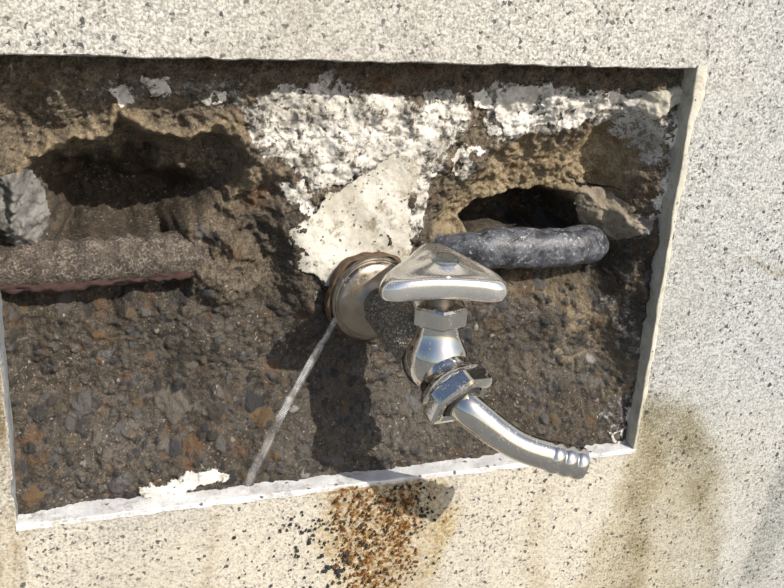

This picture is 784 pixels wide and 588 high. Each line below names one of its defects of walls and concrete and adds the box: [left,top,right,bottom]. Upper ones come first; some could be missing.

peeling [140,76,171,97]
spalling [27,83,247,241]
spalling [265,78,679,245]
spalling [550,264,581,274]
peeling [609,406,632,444]
corrosion [328,483,423,588]